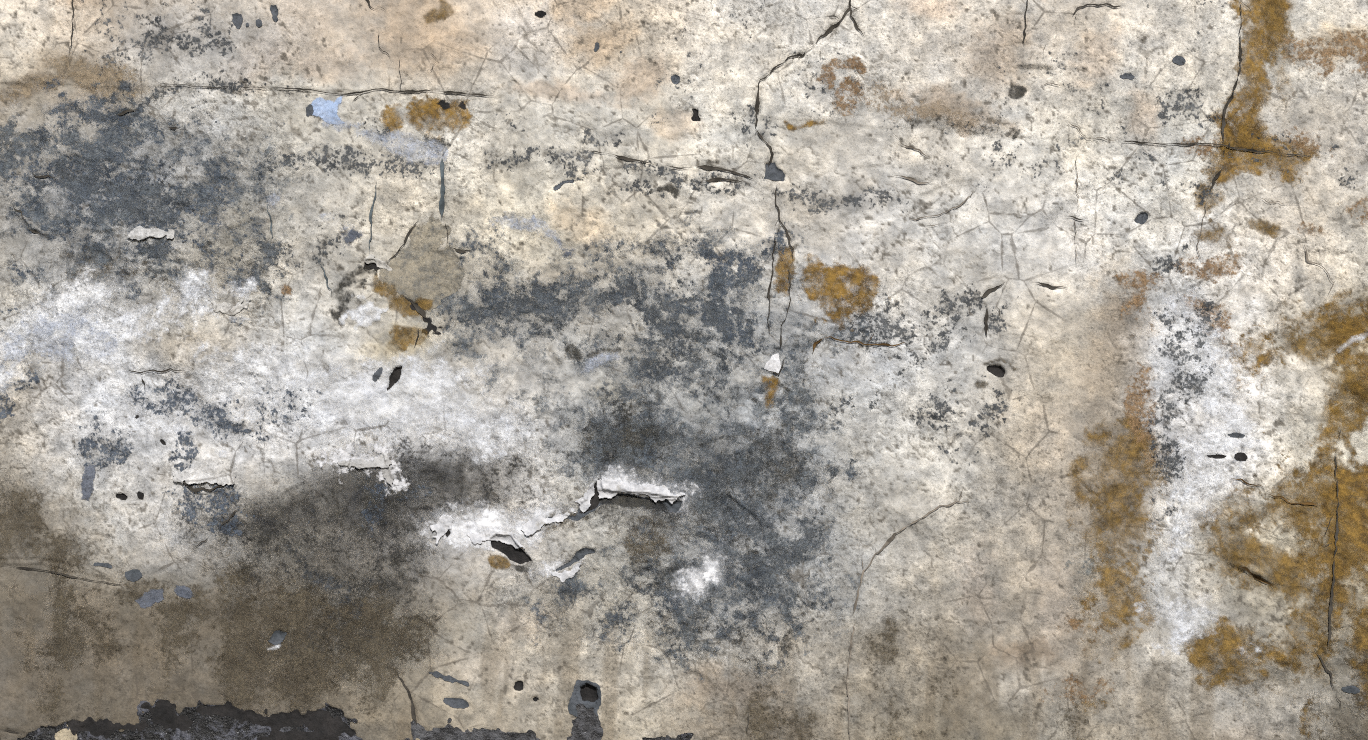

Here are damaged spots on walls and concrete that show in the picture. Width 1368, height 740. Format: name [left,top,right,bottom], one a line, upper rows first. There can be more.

water stain [0,0,457,420]
crack [161,0,487,101]
corrosion [381,97,472,153]
water stain [480,113,625,181]
crack [591,0,906,376]
corrosion [774,247,879,325]
crack [981,0,1318,337]
corrosion [1115,0,1368,315]
water stain [0,183,1020,740]
peeling [430,478,686,572]
peeling [551,548,595,582]
corrosion [1182,291,1368,685]